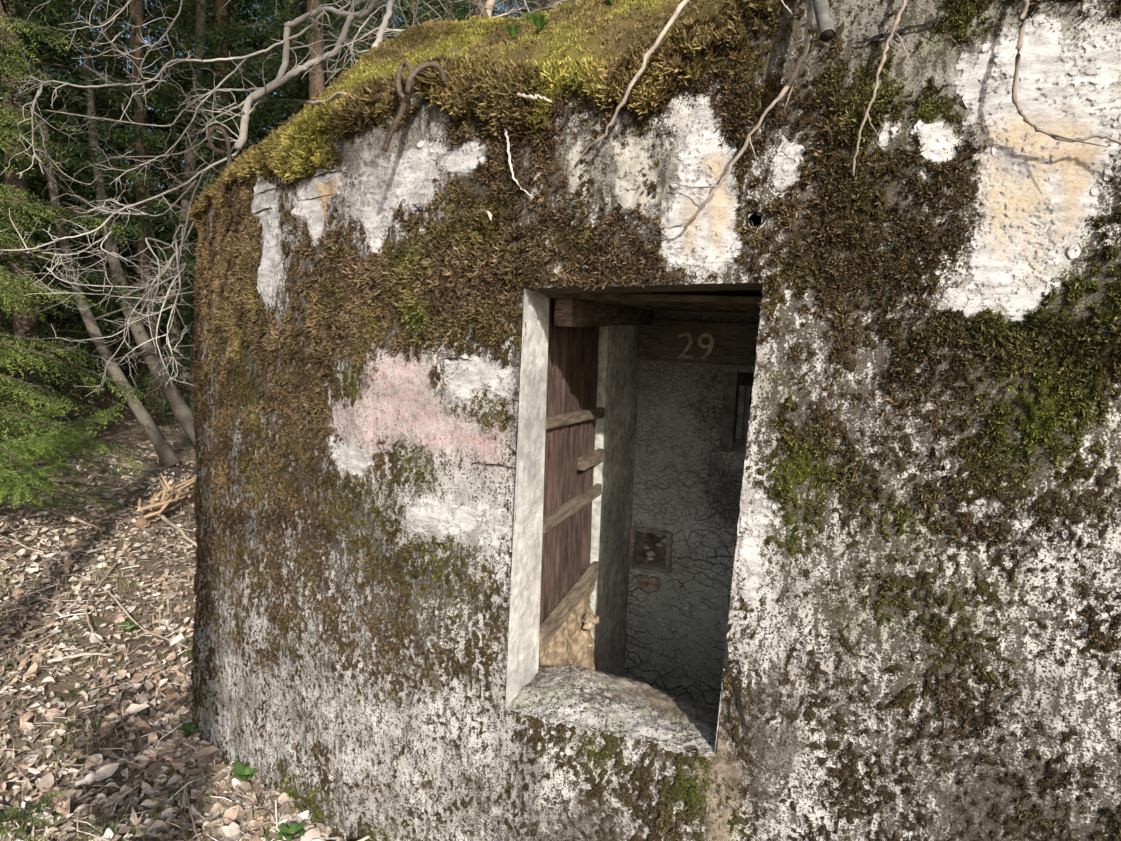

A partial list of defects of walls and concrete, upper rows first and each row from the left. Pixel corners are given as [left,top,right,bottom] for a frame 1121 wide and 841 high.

crack [625,535,749,736]